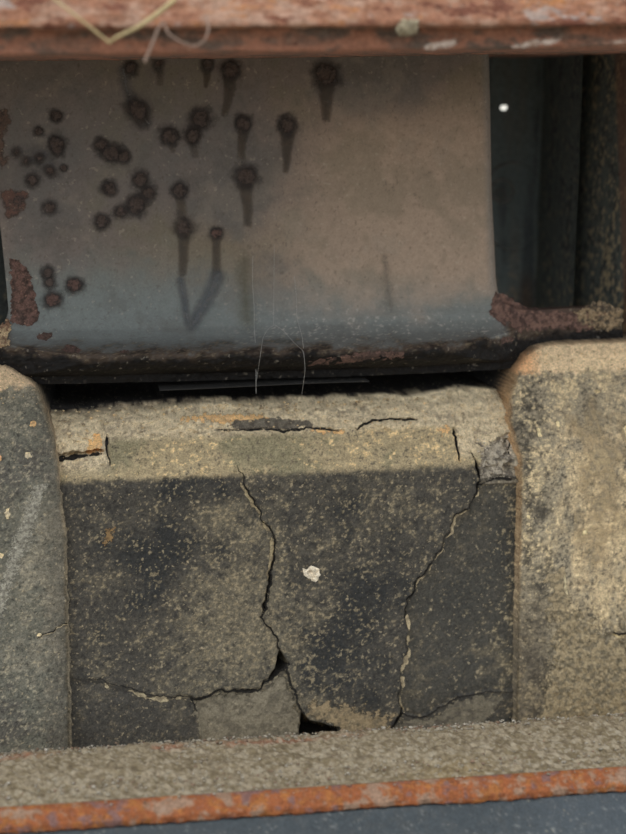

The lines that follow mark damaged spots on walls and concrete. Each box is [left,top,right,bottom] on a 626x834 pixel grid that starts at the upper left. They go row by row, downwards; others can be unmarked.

corrosion [0,0,626,32]
corrosion [0,109,68,219]
corrosion [201,59,258,225]
corrosion [94,171,157,231]
corrosion [9,258,85,326]
corrosion [489,292,607,344]
crack [59,436,111,463]
crack [216,418,418,433]
spalling [481,436,514,480]
crack [89,465,306,720]
crack [390,429,512,729]
corrosion [0,766,626,834]